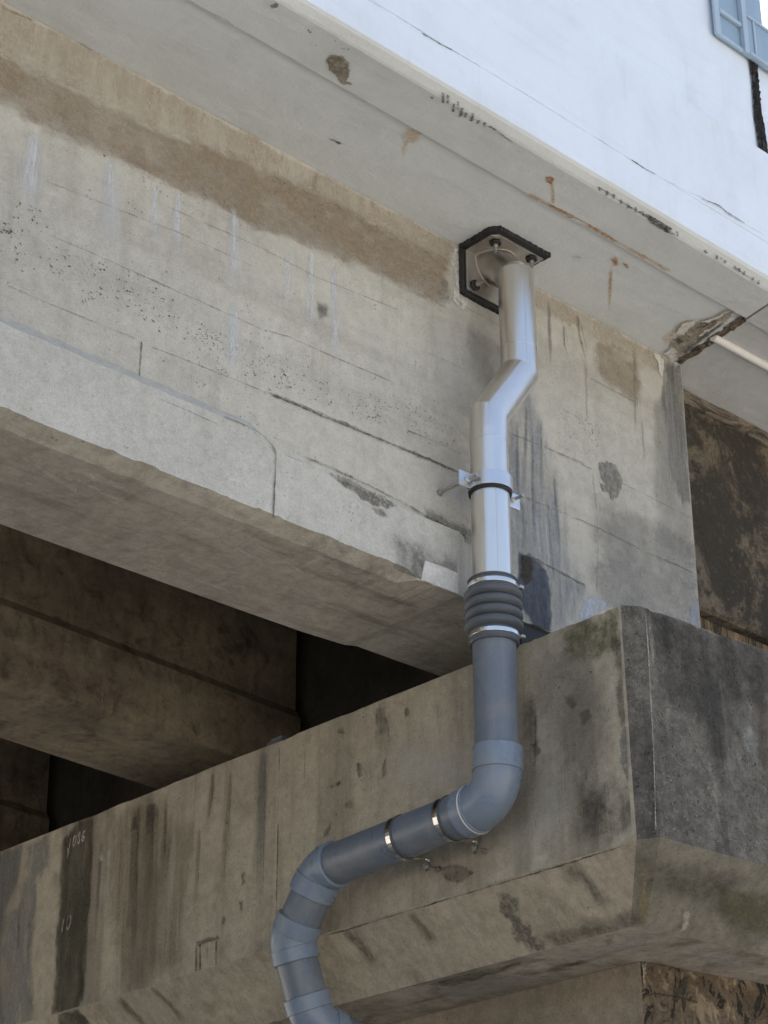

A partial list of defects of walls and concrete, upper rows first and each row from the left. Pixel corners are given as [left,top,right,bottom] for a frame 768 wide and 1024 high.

water stain [0,4,468,312]
corrosion [531,177,616,242]
peeling [653,311,734,377]
water stain [510,400,561,631]